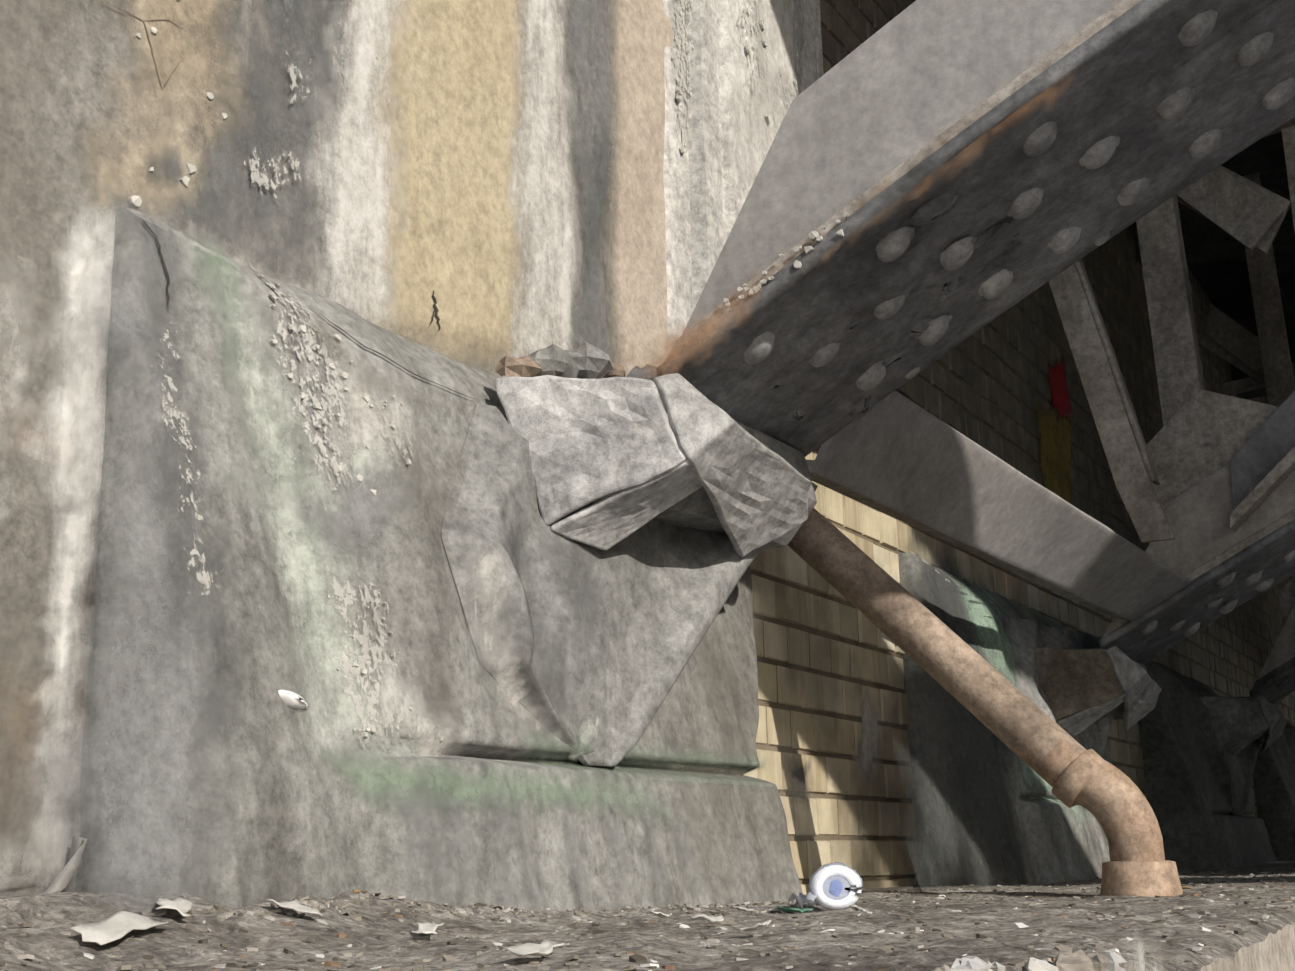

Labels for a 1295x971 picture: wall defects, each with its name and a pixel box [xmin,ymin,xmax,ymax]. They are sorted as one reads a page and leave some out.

crack [137,214,170,312]
peeling [247,257,415,512]
crack [308,303,473,399]
water stain [176,0,673,757]
spalling [495,341,657,388]
corrosion [651,303,742,370]